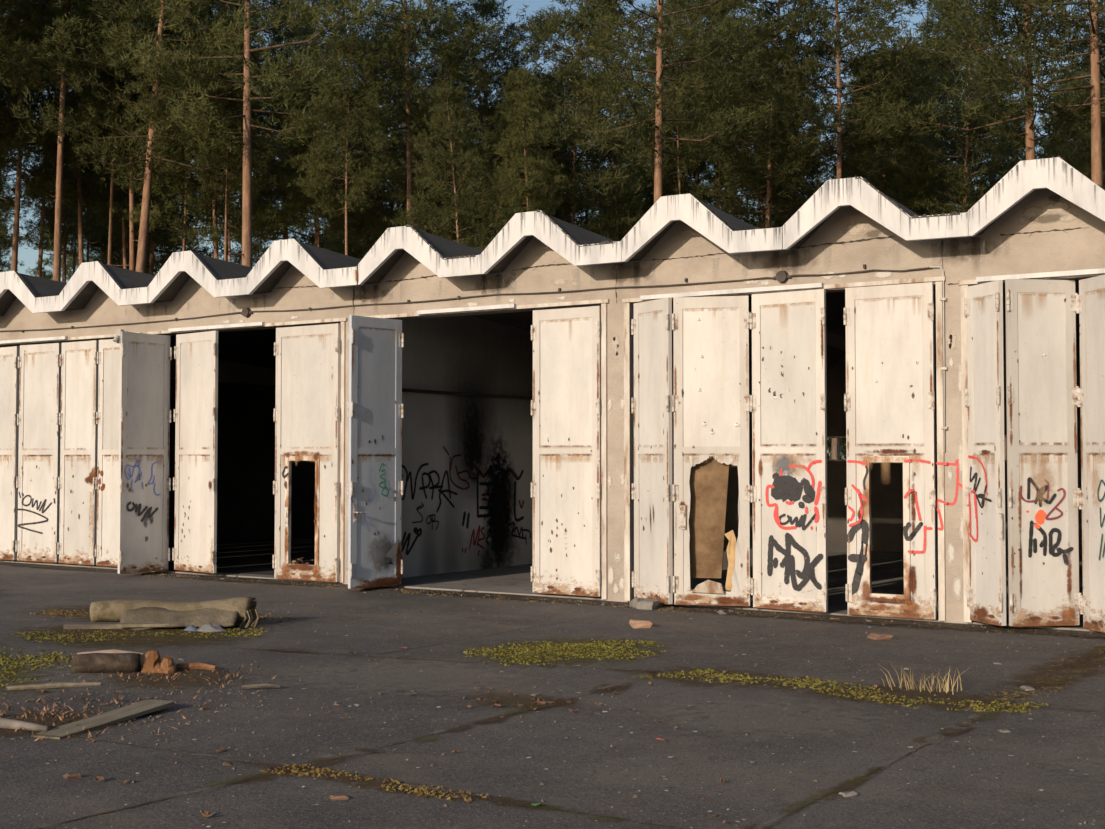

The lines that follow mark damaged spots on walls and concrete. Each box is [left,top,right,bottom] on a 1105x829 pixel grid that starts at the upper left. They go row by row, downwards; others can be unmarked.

corrosion [847,442,919,460]
corrosion [85,467,105,522]
corrosion [275,447,328,525]
leakage [459,397,511,560]
corrosion [0,550,213,574]
corrosion [276,531,335,582]
corrosion [534,576,598,597]
corrosion [849,567,933,620]
corrosion [1011,546,1022,594]
corrosion [970,603,1105,633]
crack [764,649,1105,825]
crack [35,736,275,829]